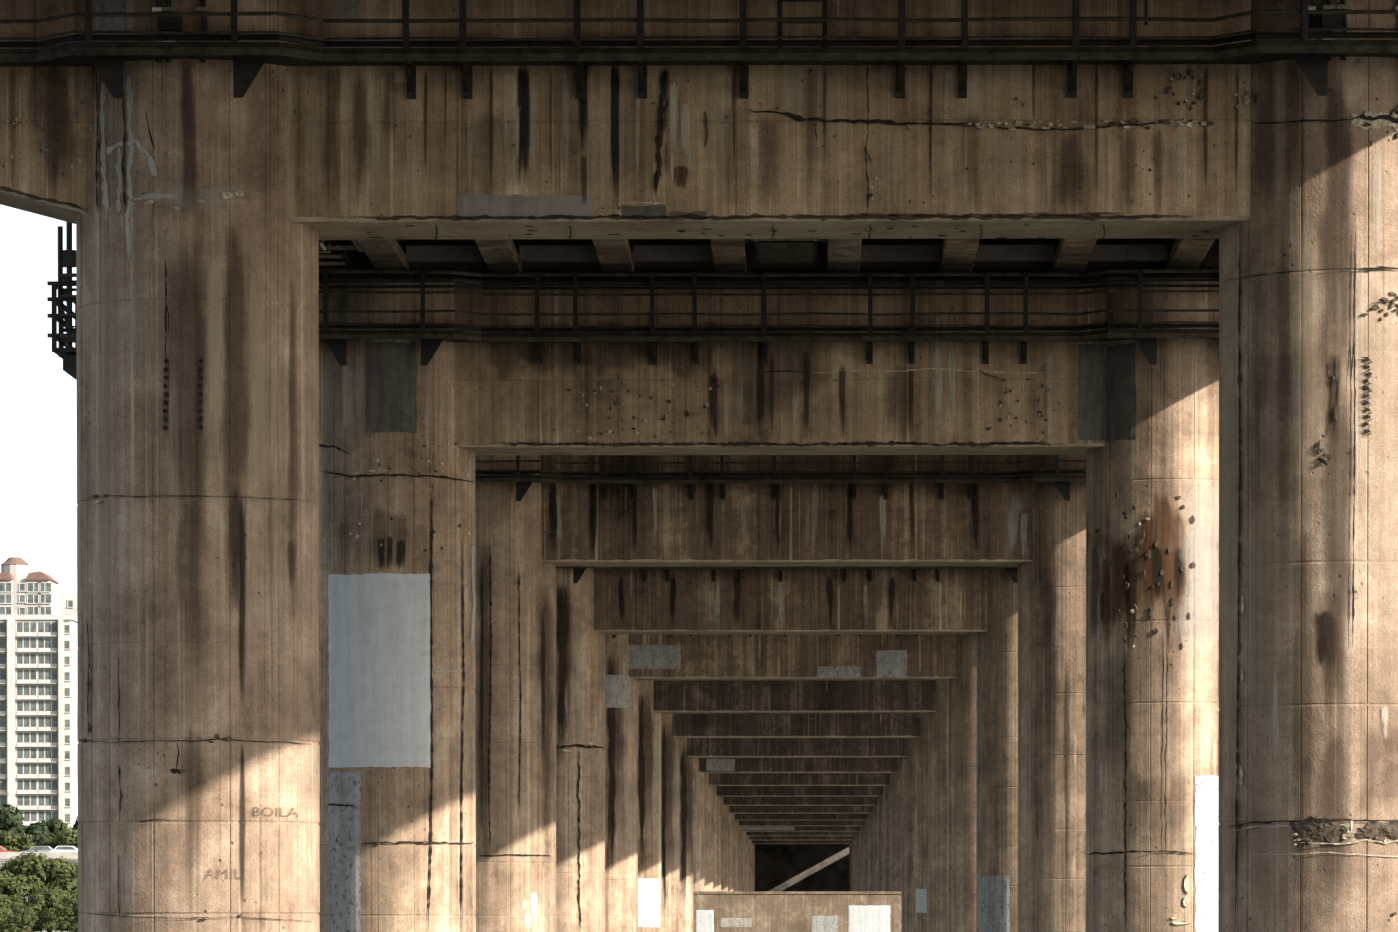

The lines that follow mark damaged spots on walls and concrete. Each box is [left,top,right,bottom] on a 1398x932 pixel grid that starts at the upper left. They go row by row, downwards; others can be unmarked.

damp [99,71,195,258]
damp [654,71,708,192]
crack [749,65,989,241]
damp [1325,84,1350,348]
spalling [1351,110,1398,145]
damp [164,274,200,604]
damp [231,496,246,693]
damp [433,545,489,783]
damp [1152,548,1183,637]
damp [1318,410,1349,665]
spalling [1289,816,1398,846]